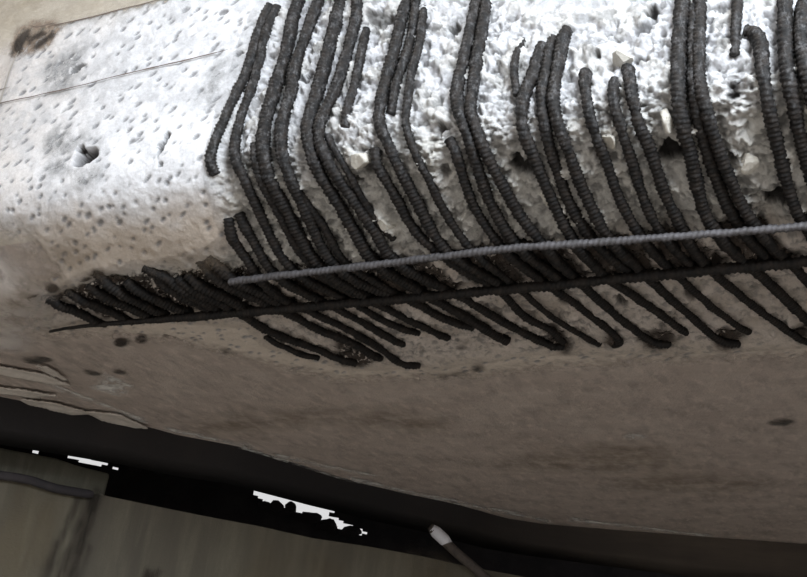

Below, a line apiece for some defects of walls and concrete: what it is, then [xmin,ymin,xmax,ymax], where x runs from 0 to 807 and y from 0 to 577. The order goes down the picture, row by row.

spalling [0,0,807,381]